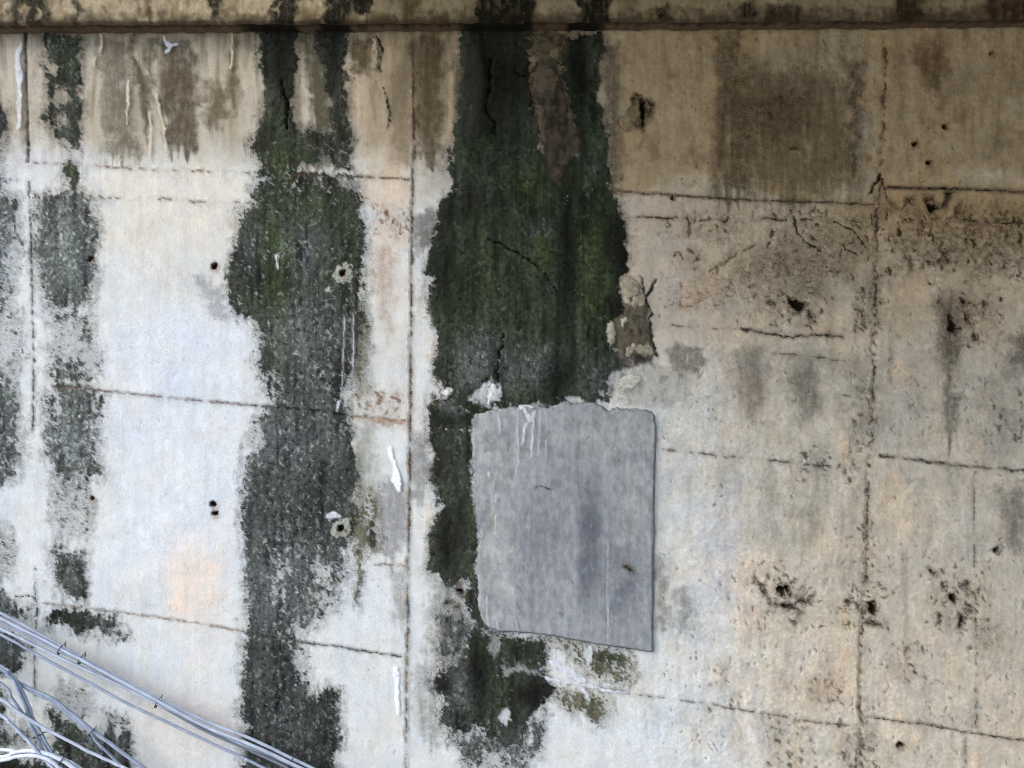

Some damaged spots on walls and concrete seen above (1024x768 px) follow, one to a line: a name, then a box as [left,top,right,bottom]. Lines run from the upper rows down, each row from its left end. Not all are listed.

leakage [39,0,239,190]
leakage [253,30,369,170]
leakage [392,30,540,172]
crack [484,59,538,128]
leakage [555,31,620,191]
peeling [620,93,654,132]
crack [793,217,864,254]
crack [869,174,887,197]
peeling [606,275,686,404]
leakage [48,479,95,601]
spalling [747,561,813,625]
leakage [454,720,545,768]